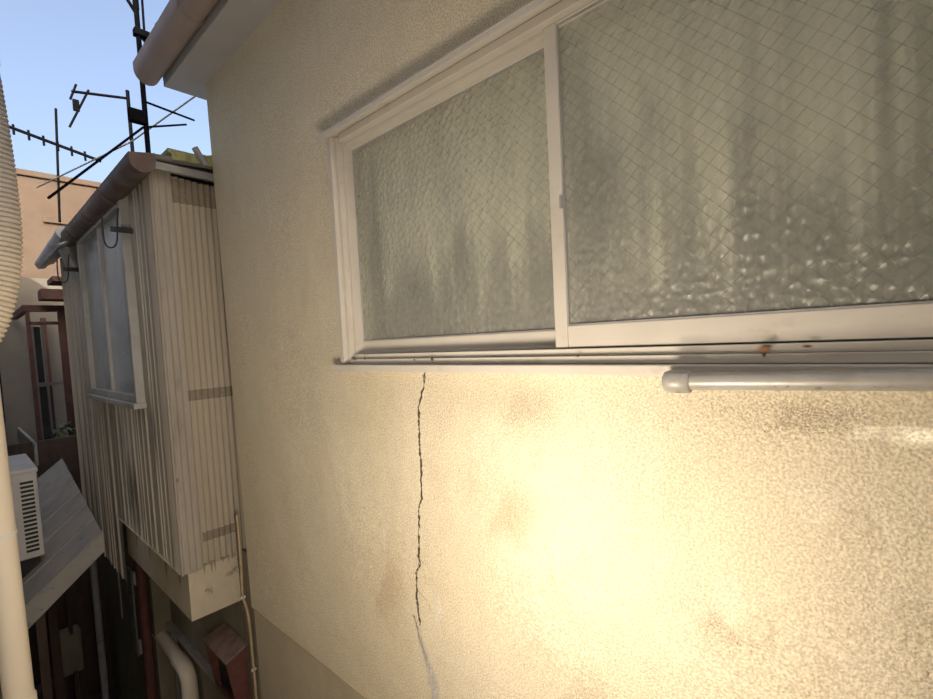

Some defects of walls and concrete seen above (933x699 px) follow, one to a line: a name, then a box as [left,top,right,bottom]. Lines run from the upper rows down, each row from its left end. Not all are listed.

crack [415,372,430,625]